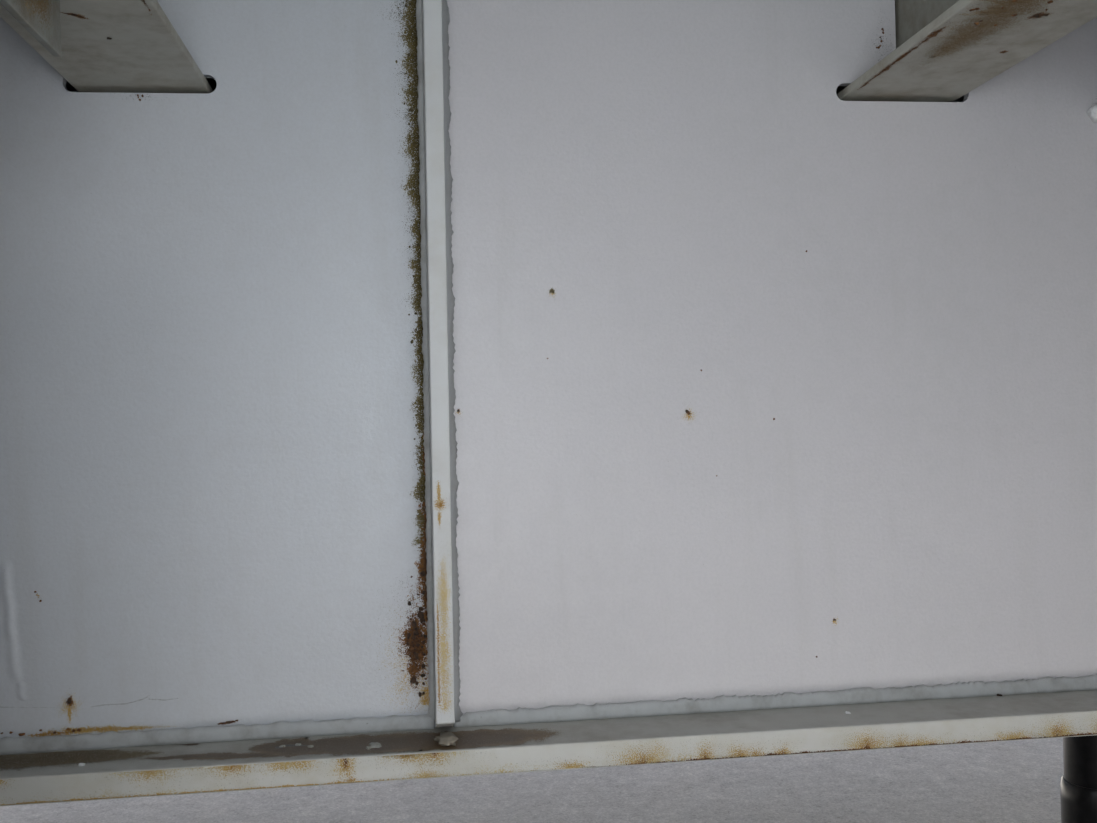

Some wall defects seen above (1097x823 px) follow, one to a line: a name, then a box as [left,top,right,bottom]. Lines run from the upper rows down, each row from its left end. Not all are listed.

rust [859,0,1067,89]
damp [383,0,426,561]
rust [379,431,453,714]
rust [0,691,176,737]
rust [0,750,596,805]
rust [606,714,1097,766]